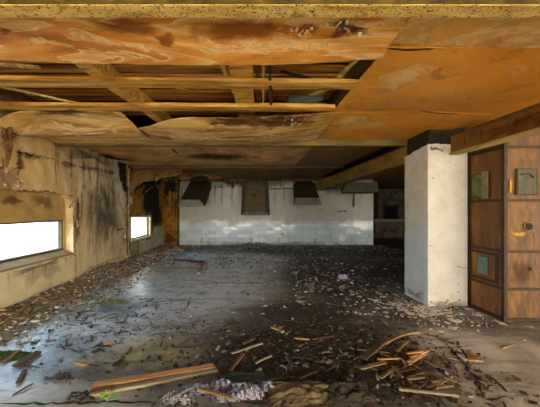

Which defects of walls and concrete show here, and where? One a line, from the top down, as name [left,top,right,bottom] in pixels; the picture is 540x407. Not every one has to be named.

damp [205,21,320,55]
crack [387,45,436,53]
damp [211,113,311,130]
peeling [0,156,24,188]